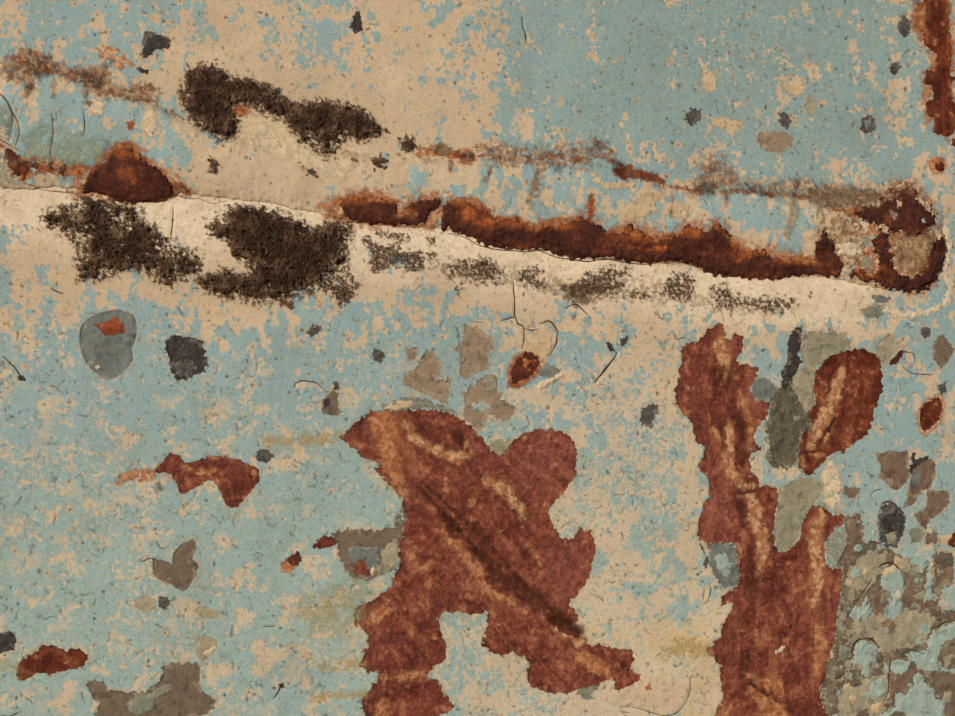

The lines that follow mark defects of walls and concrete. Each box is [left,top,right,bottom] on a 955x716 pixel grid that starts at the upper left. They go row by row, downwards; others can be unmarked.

rust [0,140,190,206]
crack [166,194,225,240]
damp [231,106,356,183]
crack [449,233,708,273]
rust [317,139,947,296]
peeling [164,335,209,380]
spalling [751,326,851,471]
rust [798,348,904,476]
rust [268,408,641,716]
rust [663,322,845,716]
peeling [819,451,955,716]
peeling [87,634,217,716]